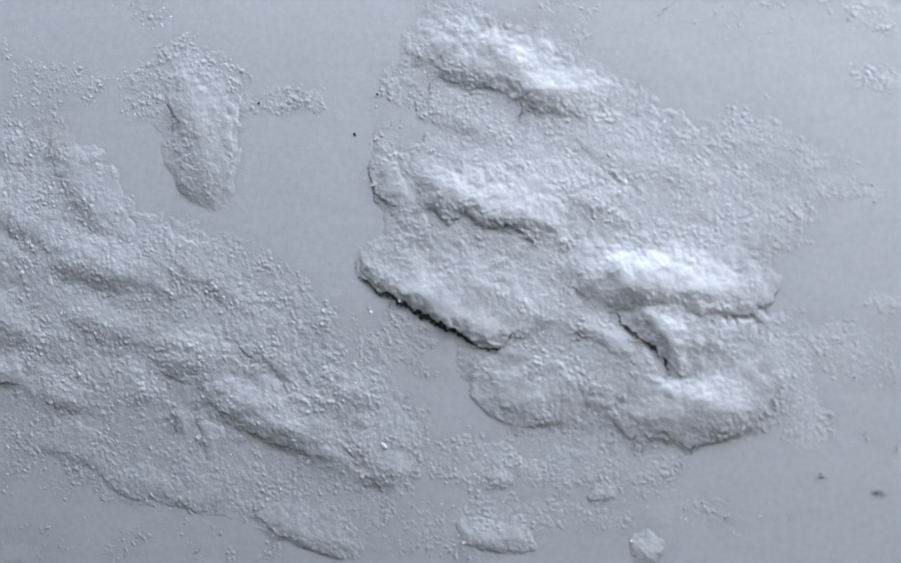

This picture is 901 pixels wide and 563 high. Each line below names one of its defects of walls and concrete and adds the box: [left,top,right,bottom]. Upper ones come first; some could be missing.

crack [561,271,670,376]